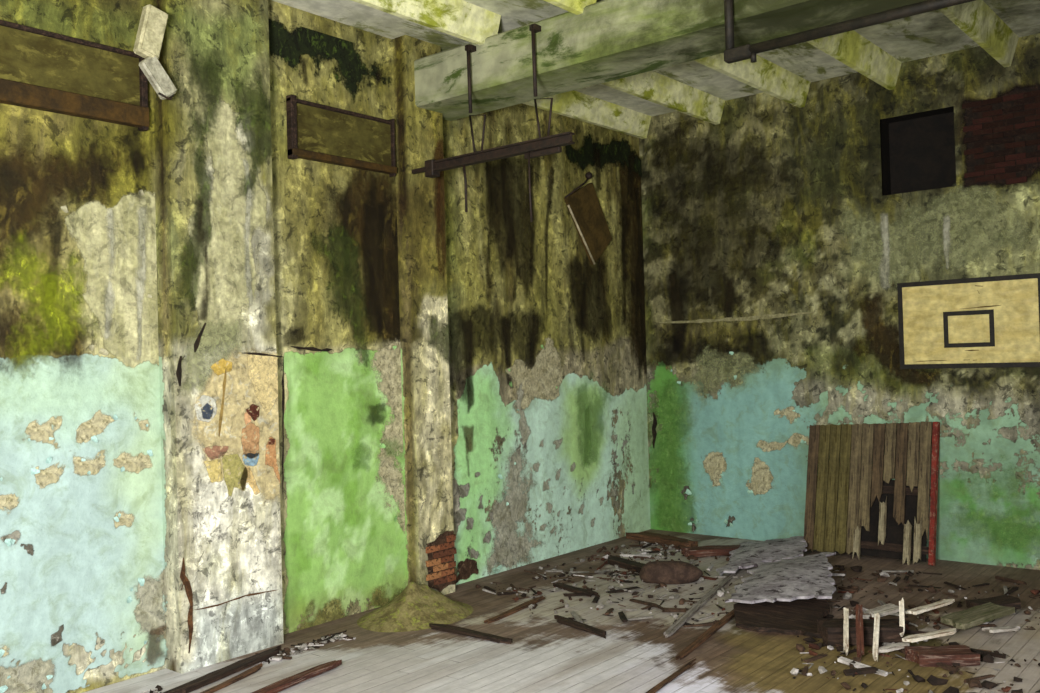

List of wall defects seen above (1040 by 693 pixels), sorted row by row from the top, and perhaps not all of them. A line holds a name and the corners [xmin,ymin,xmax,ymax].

damp [0,128,150,365]
corrosion [435,139,446,272]
damp [429,157,554,412]
flaking render [844,83,1040,289]
damp [856,292,938,386]
peeling [25,410,153,488]
peeling [425,337,576,592]
peeling [746,406,809,495]
peeling [1,530,34,556]
peeling [0,646,55,693]
peeling [51,624,64,646]
peeling [127,573,165,644]